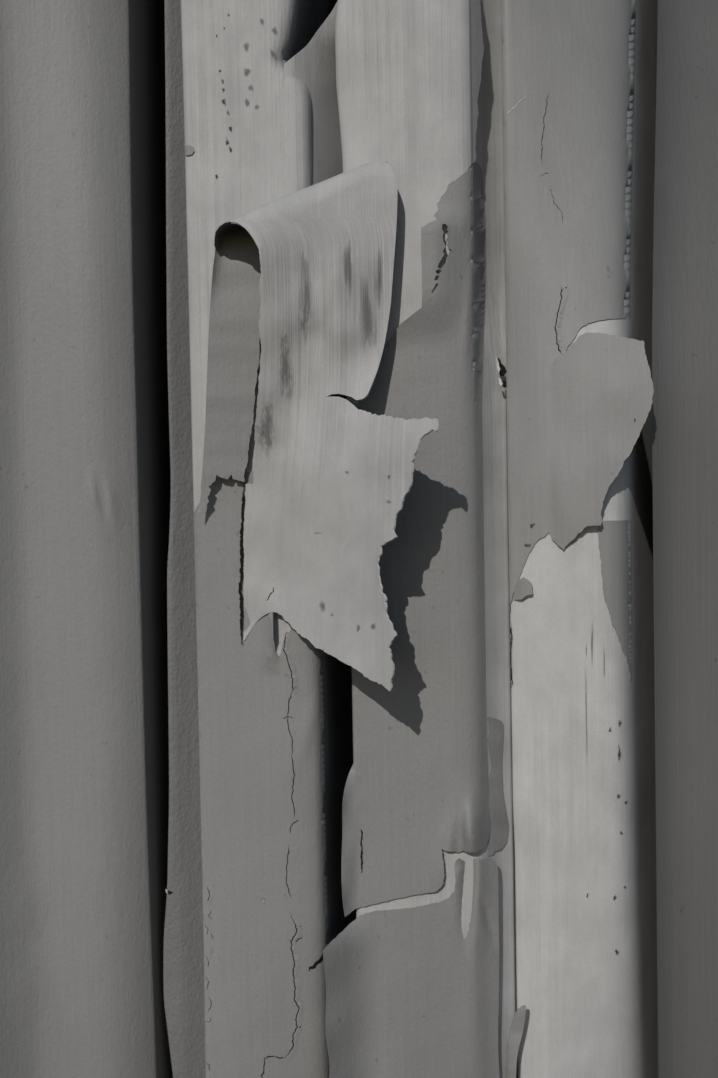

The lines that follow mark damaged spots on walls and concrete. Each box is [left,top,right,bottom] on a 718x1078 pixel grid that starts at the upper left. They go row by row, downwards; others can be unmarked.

peeling [198,0,526,1078]
peeling [547,332,654,682]
crack [261,632,323,1078]